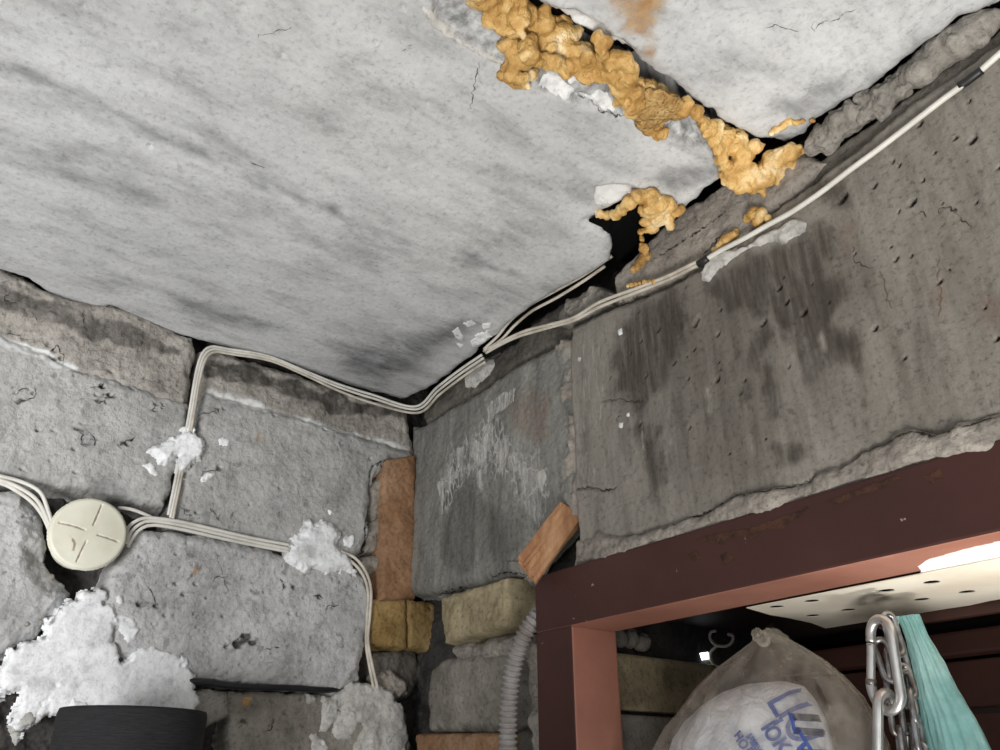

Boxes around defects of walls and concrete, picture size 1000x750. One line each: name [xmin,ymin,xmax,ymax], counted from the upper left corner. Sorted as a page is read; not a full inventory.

corrosion [617,0,661,33]
crack [653,211,726,259]
water stain [729,229,854,360]
water stain [437,389,550,525]